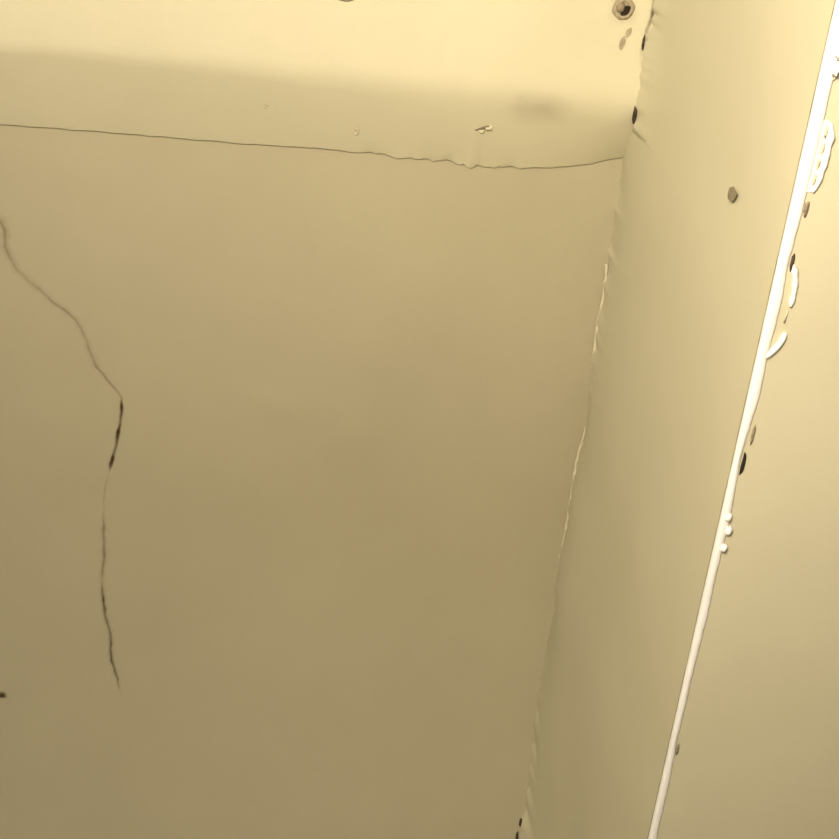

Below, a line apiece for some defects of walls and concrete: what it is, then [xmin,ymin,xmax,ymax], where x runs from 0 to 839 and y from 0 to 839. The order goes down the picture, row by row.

crack [109,403,123,467]